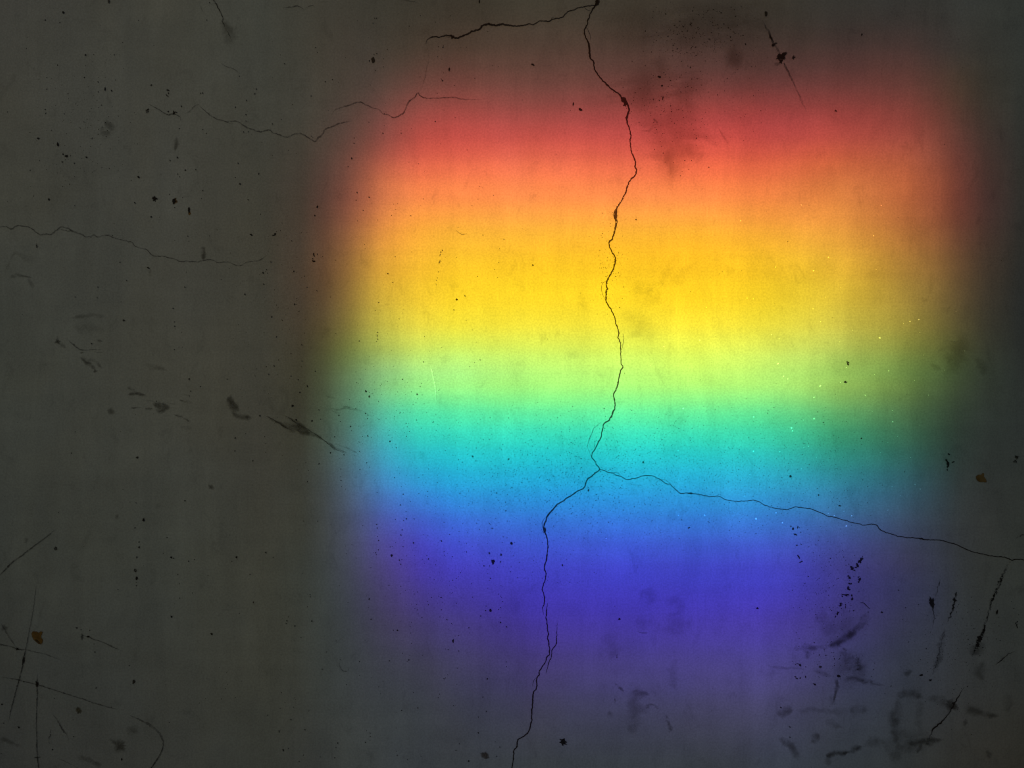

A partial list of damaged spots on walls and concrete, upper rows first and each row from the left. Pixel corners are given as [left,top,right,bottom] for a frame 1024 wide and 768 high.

crack [426,0,1024,768]